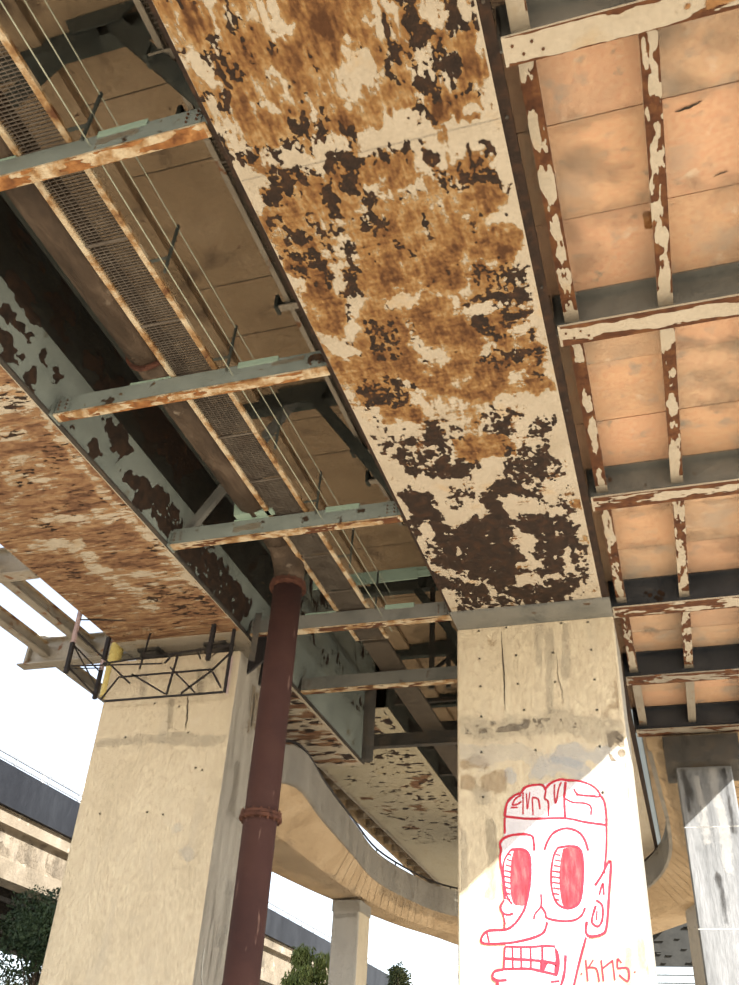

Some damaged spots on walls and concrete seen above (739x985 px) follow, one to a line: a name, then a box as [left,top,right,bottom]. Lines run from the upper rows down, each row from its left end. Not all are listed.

rust [0,0,556,493]
peeling [0,269,64,411]
peeling [128,405,204,478]
peeling [87,417,183,567]
rust [0,366,303,643]
rust [304,517,401,534]
peeling [356,375,589,611]
peeling [121,546,253,624]
crack [499,631,507,705]
rust [286,693,357,763]
spalling [464,718,562,734]
rust [399,775,430,789]